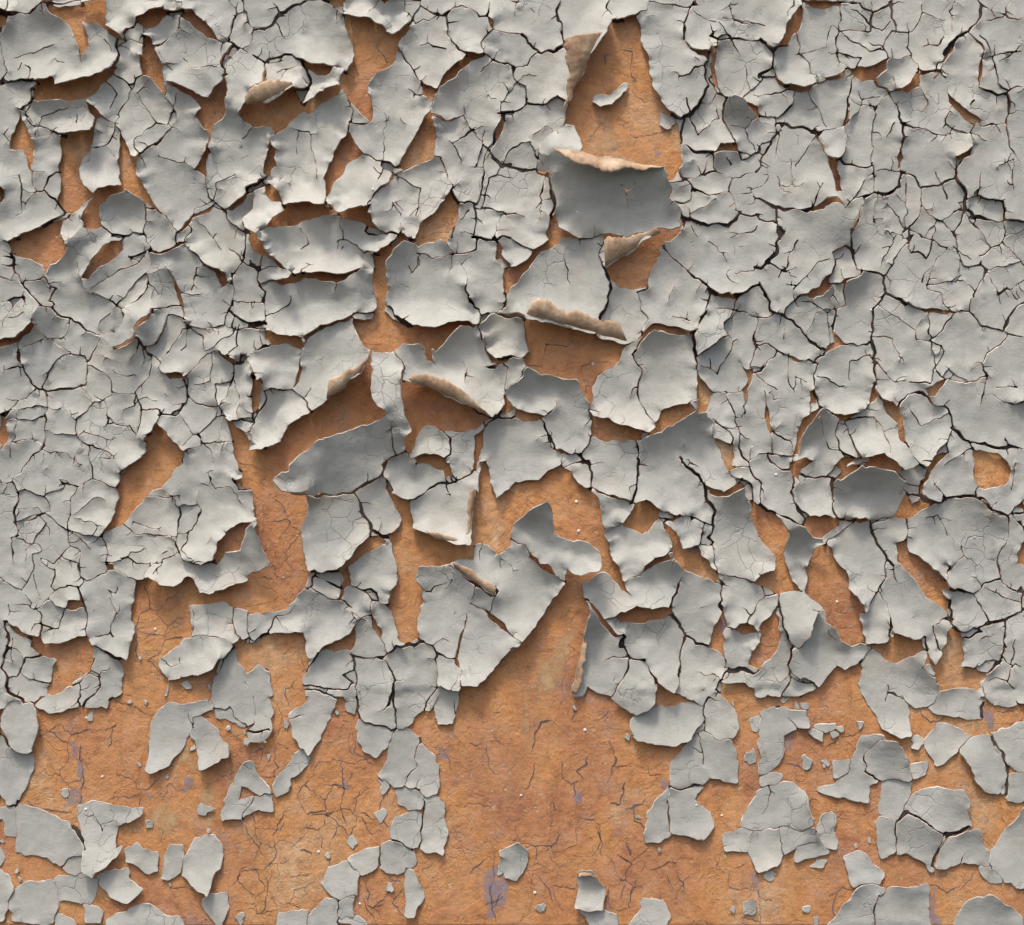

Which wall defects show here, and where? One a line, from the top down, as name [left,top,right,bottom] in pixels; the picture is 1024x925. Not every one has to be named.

crack [324,0,656,530]
crack [0,0,479,925]
peeling [272,351,412,496]
peeling [410,461,527,555]
crack [604,0,1024,826]
peeling [582,552,685,620]
peeling [857,514,1024,739]
peeling [144,699,214,774]
crack [470,711,575,789]
crack [515,550,759,911]
peeling [827,850,931,925]
crack [894,785,973,893]